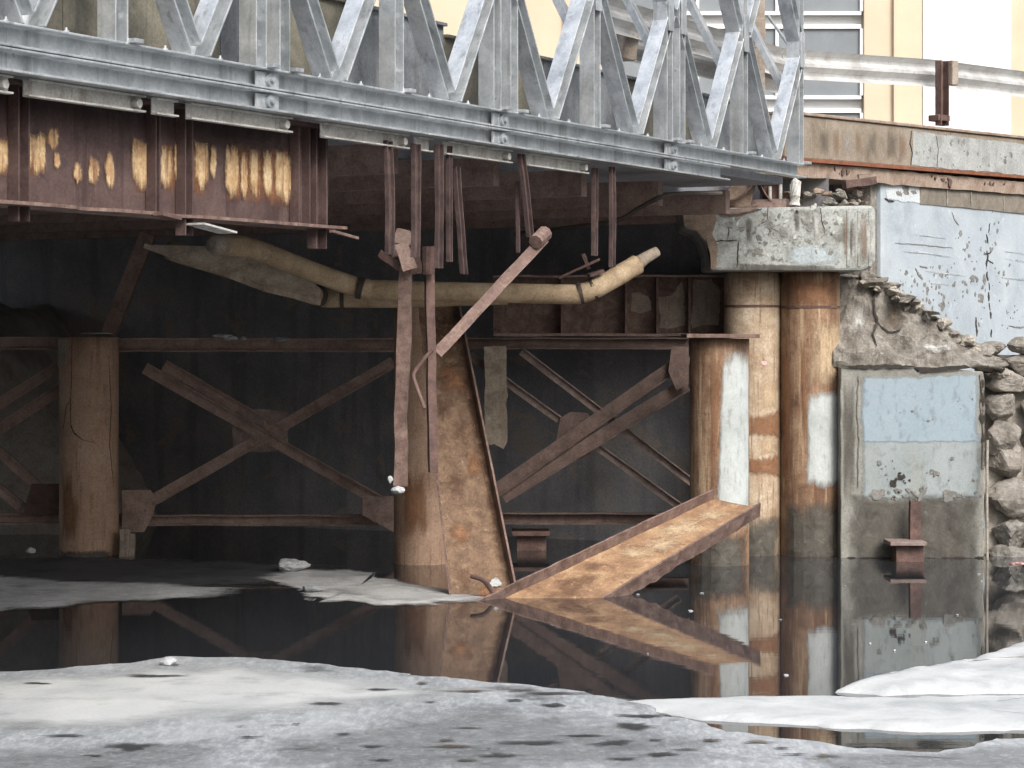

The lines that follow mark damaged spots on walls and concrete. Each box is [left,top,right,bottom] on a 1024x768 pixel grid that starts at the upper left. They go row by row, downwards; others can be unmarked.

corrosion [237,149,281,202]
crack [716,227,739,268]
peeling [898,211,1011,326]
crack [975,224,1024,337]
spalling [915,365,986,503]
peeling [869,460,925,500]
corrosion [622,511,724,557]
water stain [853,497,975,558]